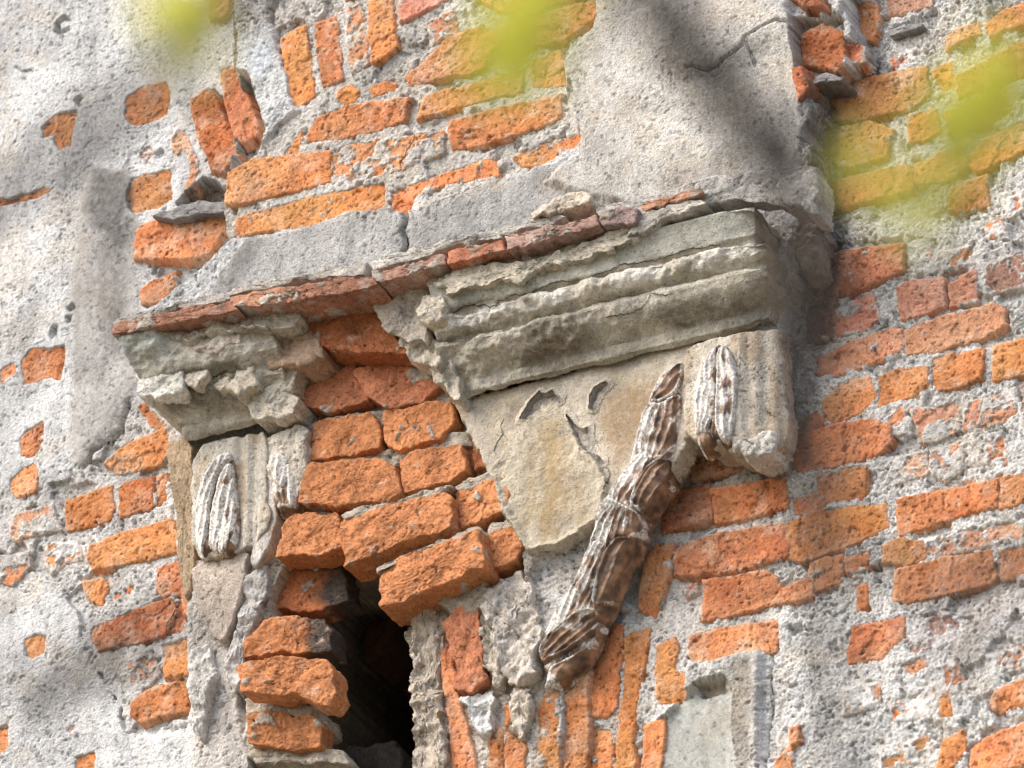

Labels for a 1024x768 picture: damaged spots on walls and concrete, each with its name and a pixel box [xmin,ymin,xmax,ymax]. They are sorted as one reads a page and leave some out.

spalling [123,0,597,312]
spalling [801,0,1024,228]
spalling [0,347,66,385]
spalling [822,137,1024,568]
spalling [0,399,191,734]
spalling [235,313,821,768]
spalling [843,563,1024,768]